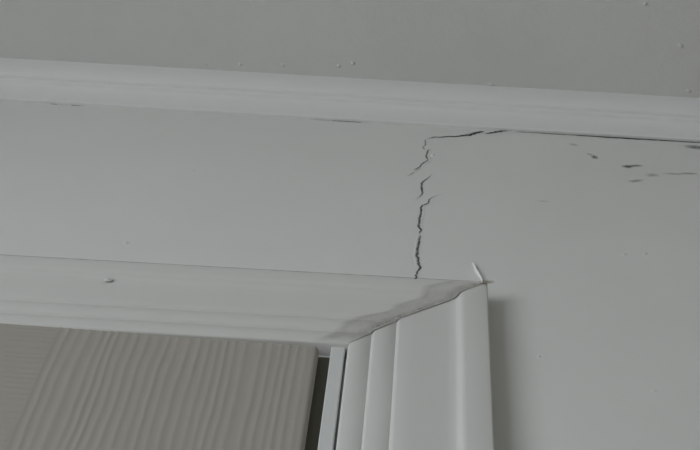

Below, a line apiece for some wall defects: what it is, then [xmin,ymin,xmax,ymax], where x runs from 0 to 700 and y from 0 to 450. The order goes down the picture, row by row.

crack [388,129,700,279]